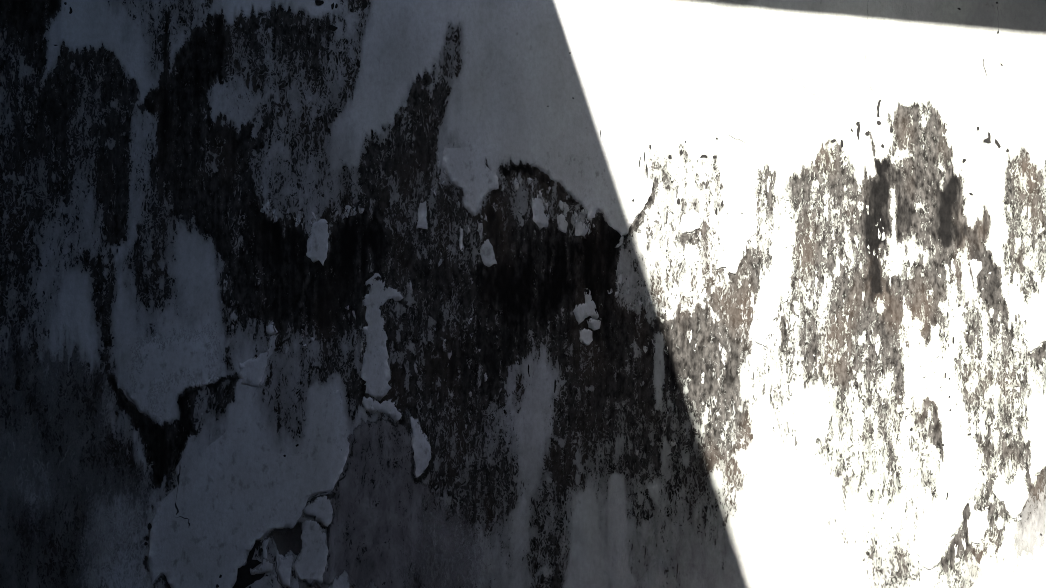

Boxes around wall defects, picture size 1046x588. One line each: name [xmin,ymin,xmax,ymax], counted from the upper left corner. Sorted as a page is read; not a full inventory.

peeling [831,99,893,148]
peeling [258,185,364,265]
peeling [411,130,653,267]
peeling [573,288,601,346]
water stain [678,193,699,224]
peeling [714,177,791,274]
peeling [844,185,911,278]
peeling [951,249,991,303]
peeling [989,289,1046,417]
peeling [143,273,486,588]
water stain [317,482,367,571]
peeling [914,443,1046,569]